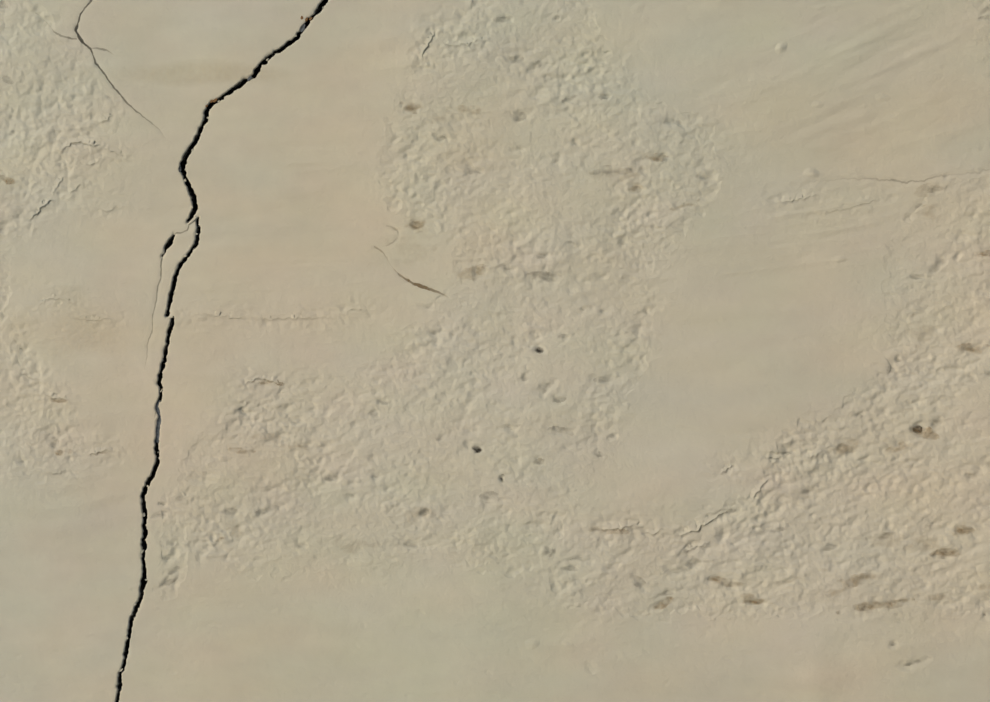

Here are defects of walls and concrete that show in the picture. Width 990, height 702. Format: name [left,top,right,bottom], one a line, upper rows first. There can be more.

crack [74,0,112,85]
crack [116,0,328,702]